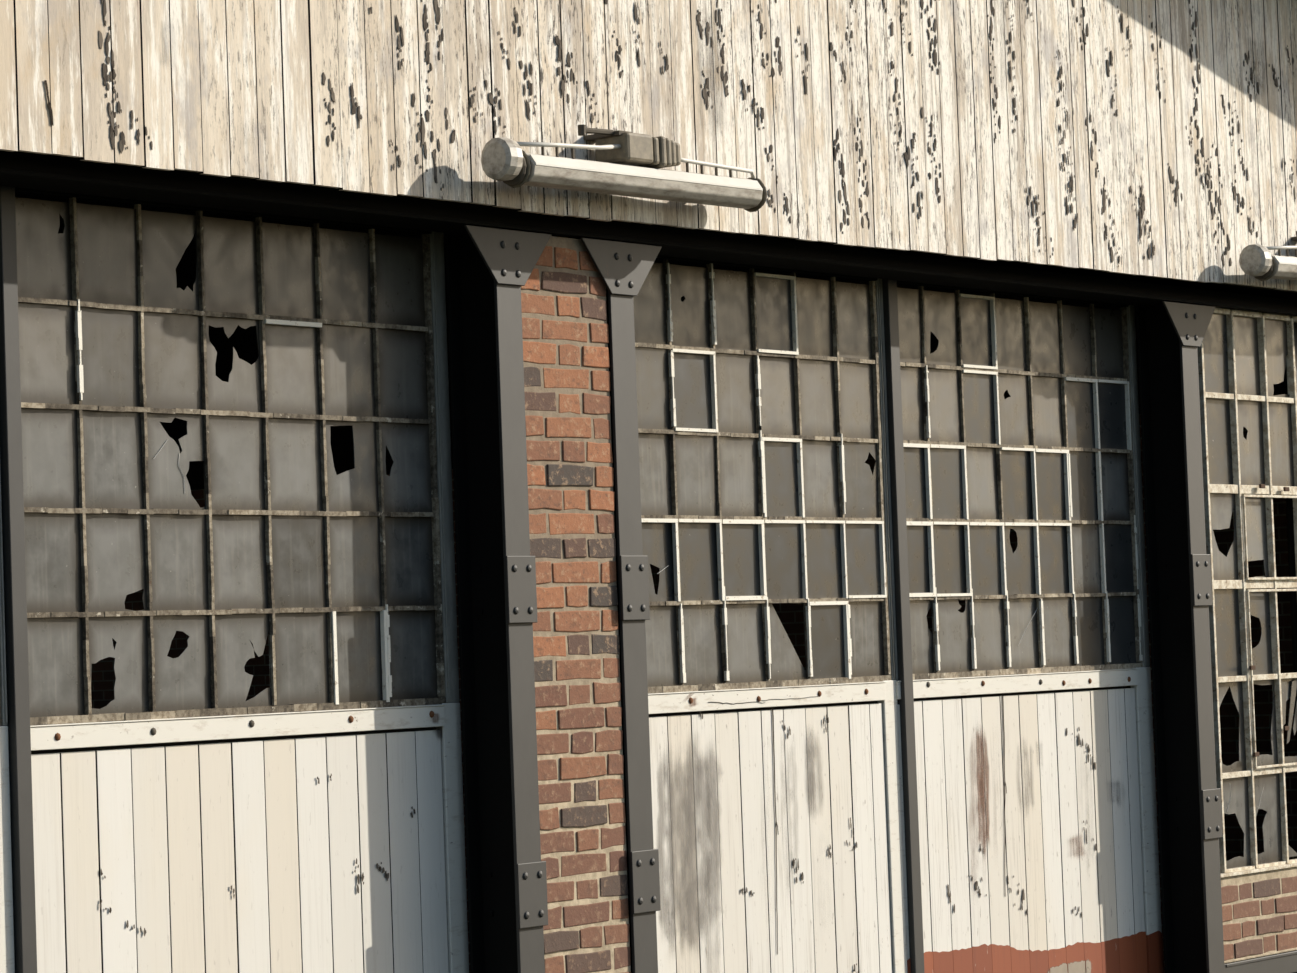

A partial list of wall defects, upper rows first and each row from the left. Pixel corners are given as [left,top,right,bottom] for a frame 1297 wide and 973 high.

peeling [99,0,153,154]
peeling [322,72,362,147]
peeling [391,0,455,199]
peeling [696,0,764,130]
peeling [834,117,870,234]
peeling [883,0,940,75]
peeling [890,61,942,219]
peeling [988,0,1034,143]
peeling [1086,112,1120,267]
peeling [1186,0,1294,266]
leakage [659,758,719,941]
rust [977,736,989,853]